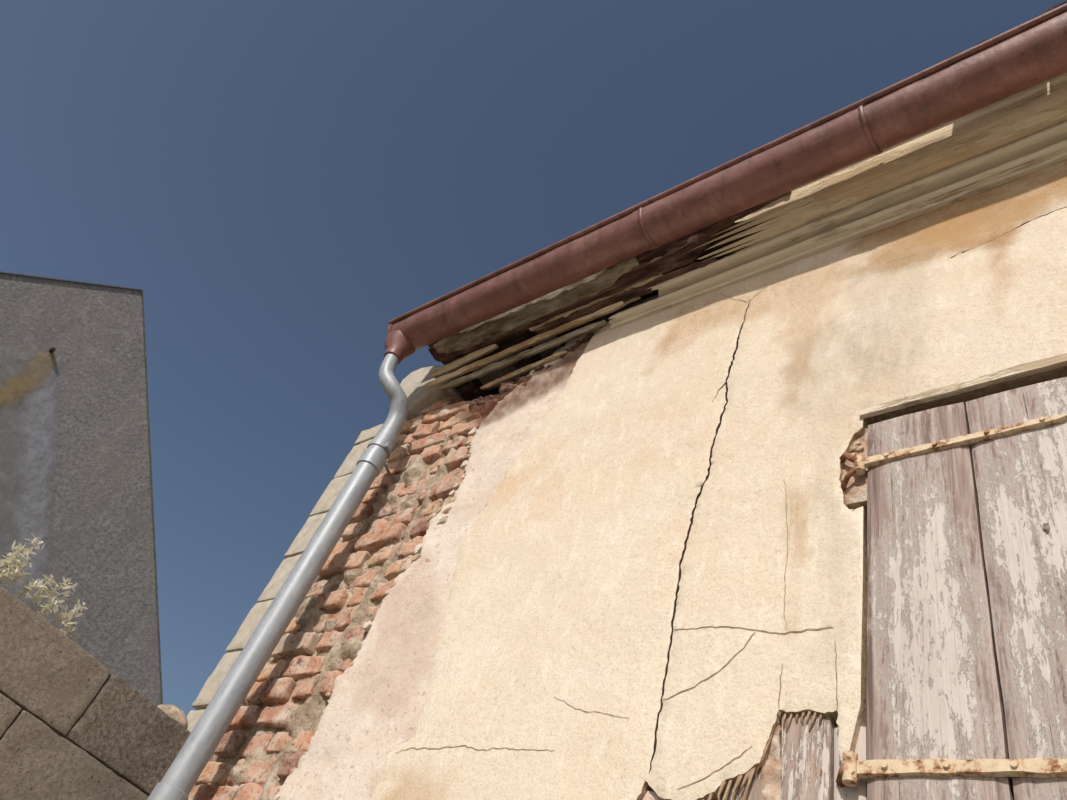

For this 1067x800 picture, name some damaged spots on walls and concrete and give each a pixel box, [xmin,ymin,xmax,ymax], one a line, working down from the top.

leakage [868,174,1067,268]
crack [951,207,1066,258]
peeling [188,310,618,800]
crack [649,289,838,773]
crack [397,745,555,753]
crack [678,746,752,789]